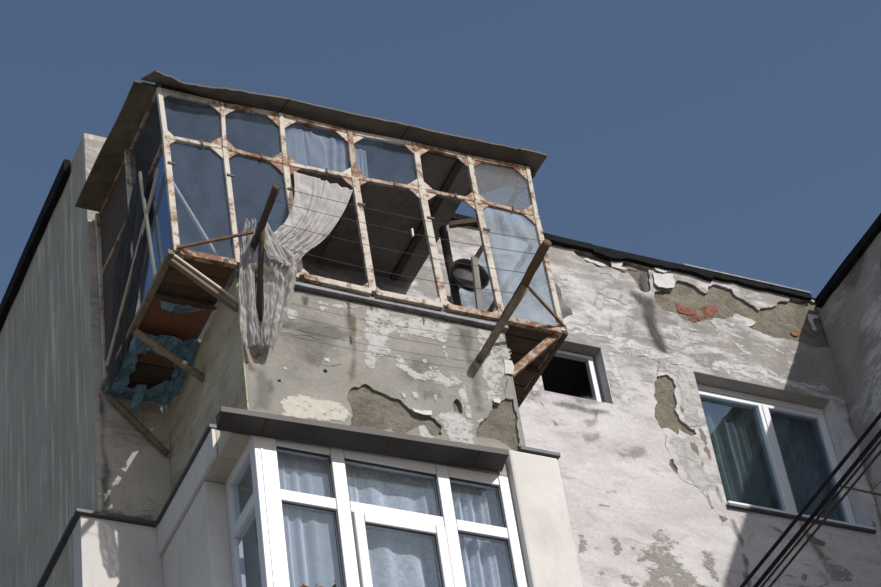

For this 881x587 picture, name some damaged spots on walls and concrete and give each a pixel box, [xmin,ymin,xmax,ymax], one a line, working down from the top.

spalling [279,300,519,451]
water stain [631,271,665,352]
spalling [527,252,830,493]
peeling [611,529,720,587]